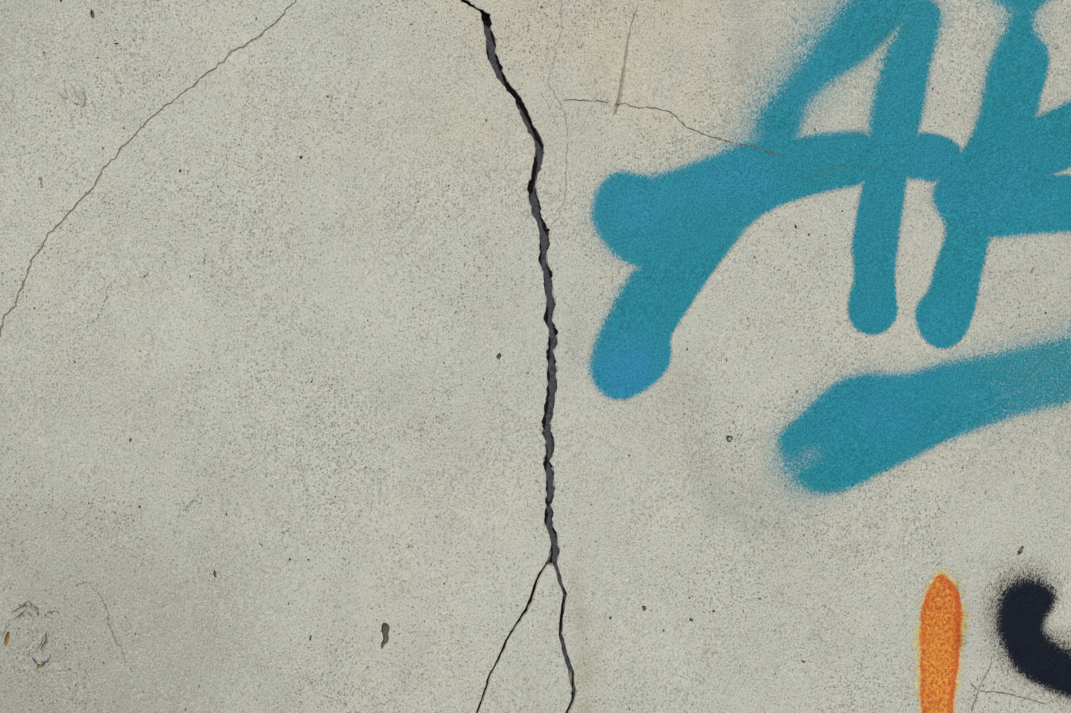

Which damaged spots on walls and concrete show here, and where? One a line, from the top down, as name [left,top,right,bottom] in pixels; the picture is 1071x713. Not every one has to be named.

crack [0,0,297,337]
crack [460,0,785,713]